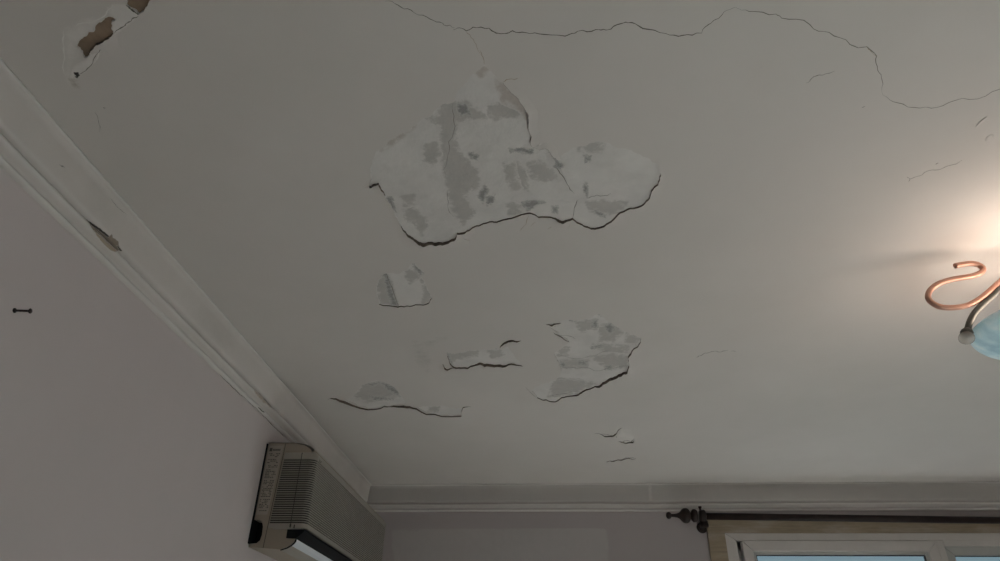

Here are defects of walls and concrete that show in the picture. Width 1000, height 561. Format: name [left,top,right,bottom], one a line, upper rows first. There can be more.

flaking render [60,0,150,90]
crack [392,1,1000,109]
peeling [376,263,434,310]
peeling [328,380,472,420]
peeling [437,340,523,373]
peeling [526,314,646,405]